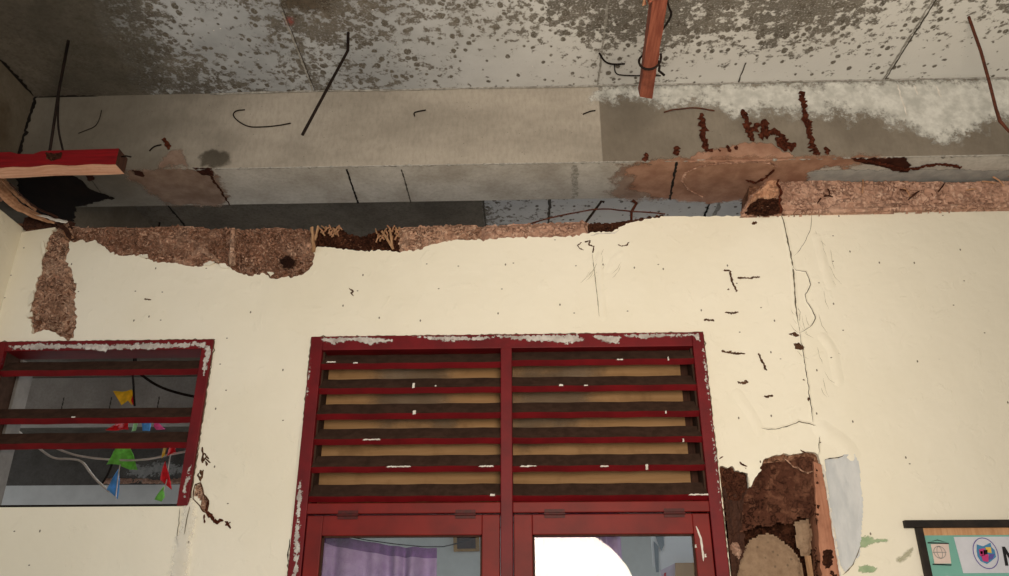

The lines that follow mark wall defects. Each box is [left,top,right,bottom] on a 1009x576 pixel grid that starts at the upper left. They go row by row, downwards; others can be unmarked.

leakage [281,0,330,17]
efflorescence [590,79,1009,145]
leakage [201,150,229,168]
peeling [783,176,1009,217]
flaking render [9,215,663,376]
peeling [417,333,711,411]
crack [761,215,836,454]
flaking render [689,424,863,576]